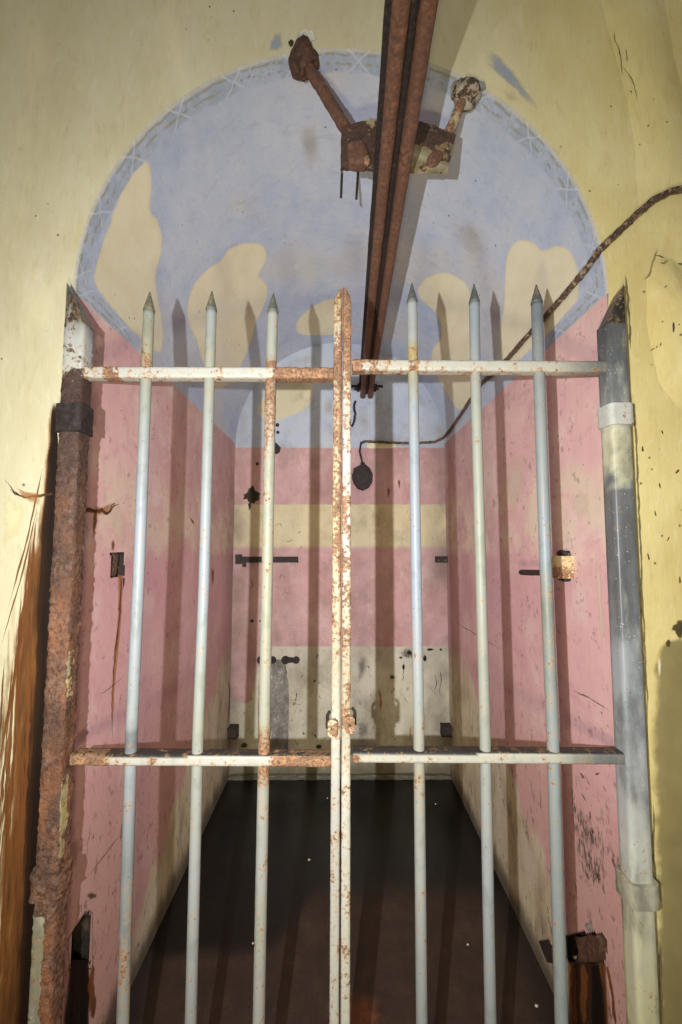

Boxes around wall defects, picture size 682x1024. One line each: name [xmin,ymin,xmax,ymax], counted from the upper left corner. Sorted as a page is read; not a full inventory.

crack [614,34,637,96]
rust [0,406,58,1024]
rust [111,575,125,719]
damp [574,804,615,893]